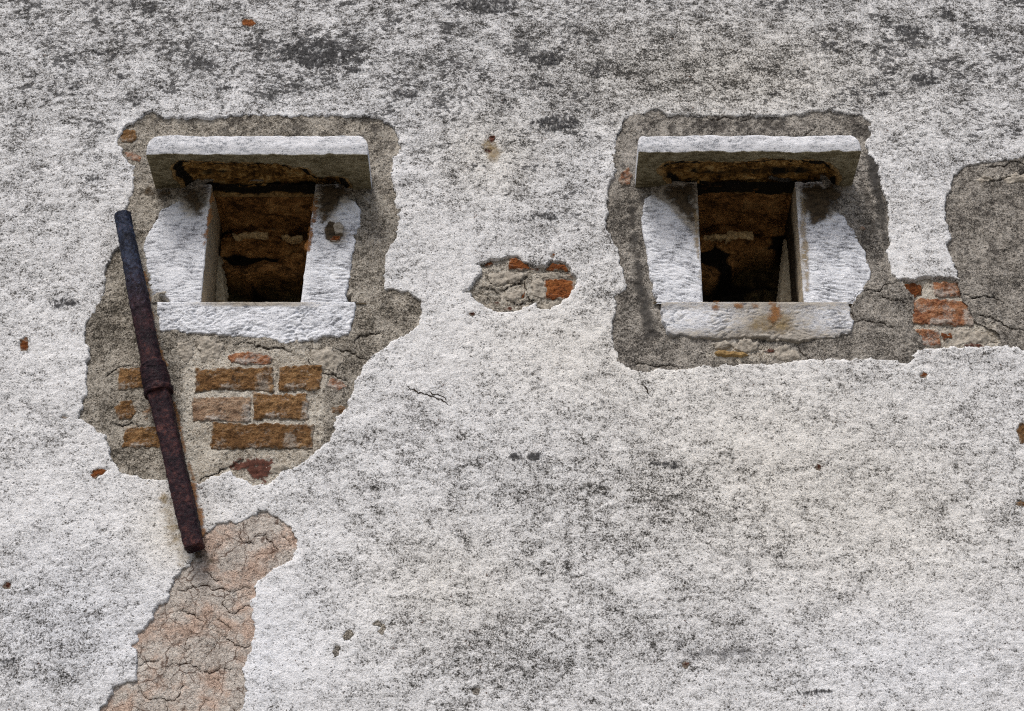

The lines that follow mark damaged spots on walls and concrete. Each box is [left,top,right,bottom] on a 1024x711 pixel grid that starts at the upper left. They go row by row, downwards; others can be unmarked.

spalling [61,249,167,484]
spalling [117,112,422,486]
crack [406,384,450,406]
spalling [465,253,576,316]
spalling [605,110,1024,374]
spalling [100,512,298,711]